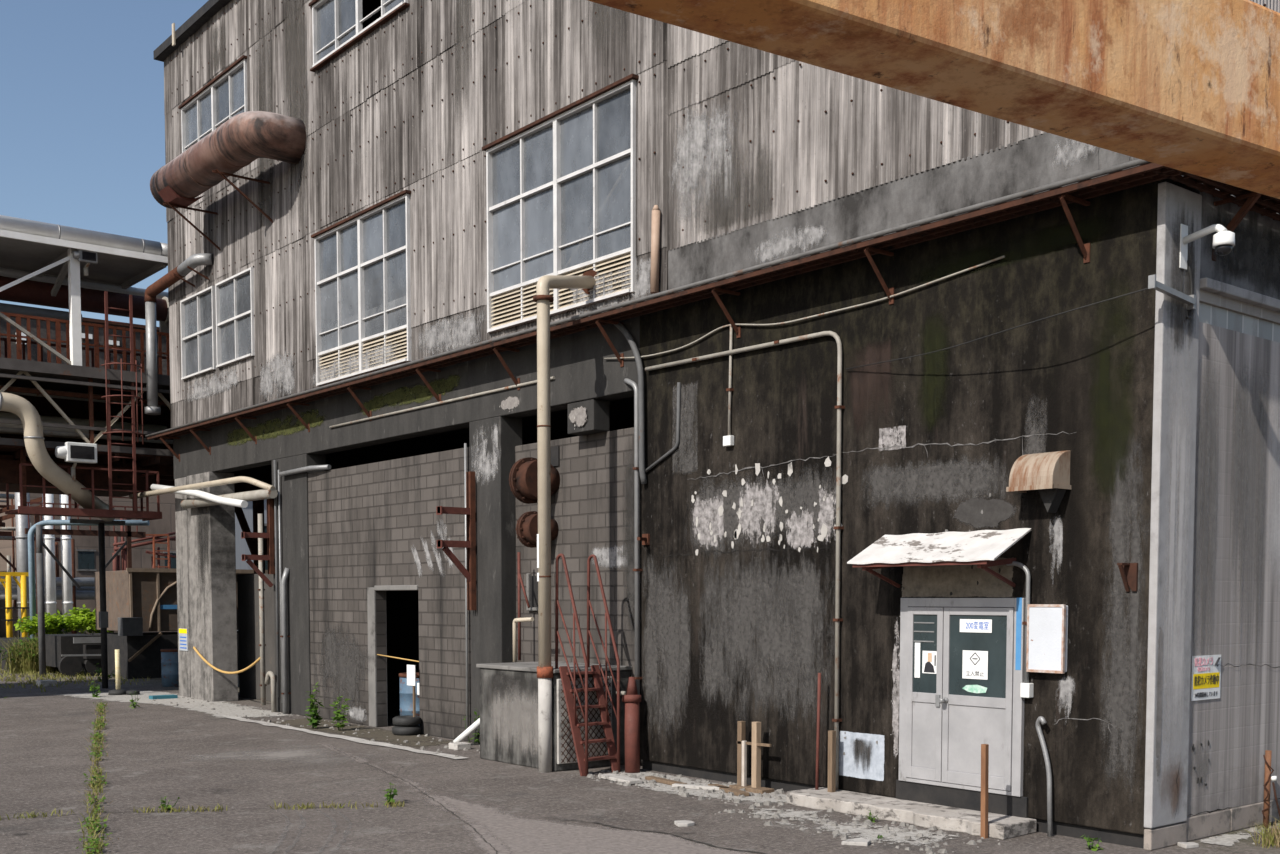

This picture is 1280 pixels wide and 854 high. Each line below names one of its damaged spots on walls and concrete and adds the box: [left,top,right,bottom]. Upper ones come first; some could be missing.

water stain [593,458,834,731]
peeling [690,456,848,556]
water stain [1101,443,1145,783]
water stain [1163,381,1219,723]
water stain [1233,378,1280,600]